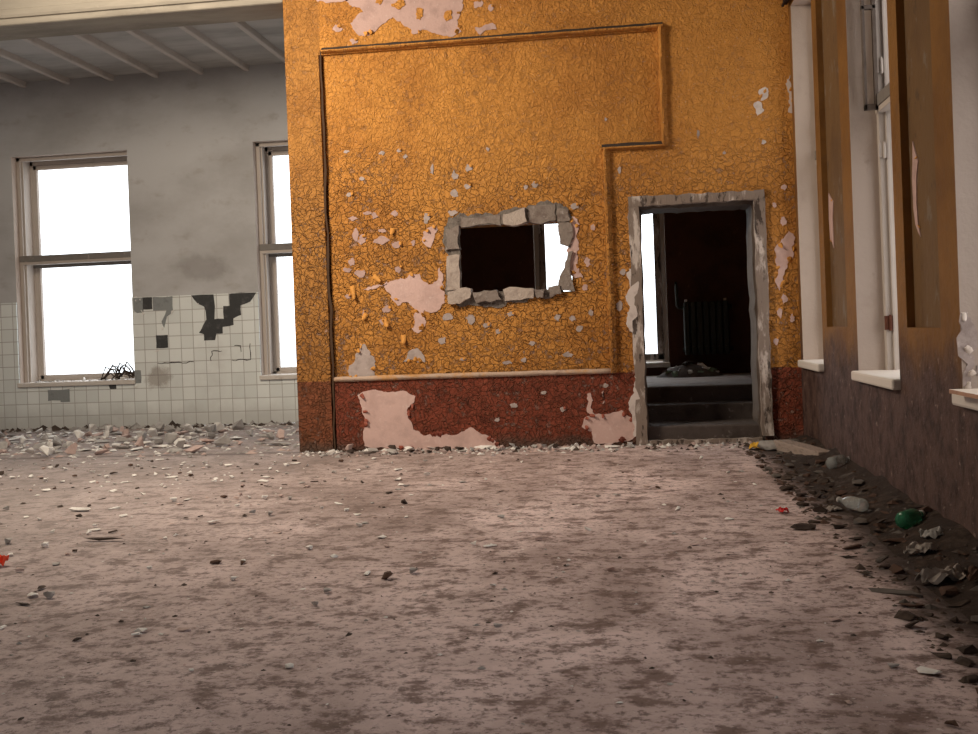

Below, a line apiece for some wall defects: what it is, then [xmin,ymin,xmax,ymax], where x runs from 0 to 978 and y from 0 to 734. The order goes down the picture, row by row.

peeling [316,0,496,45]
peeling [753,87,769,116]
peeling [450,164,473,197]
spalling [343,200,596,363]
peeling [774,217,796,322]
peeling [191,292,256,341]
peeling [348,344,376,377]
flaking render [358,390,500,450]
flaking render [582,377,640,444]